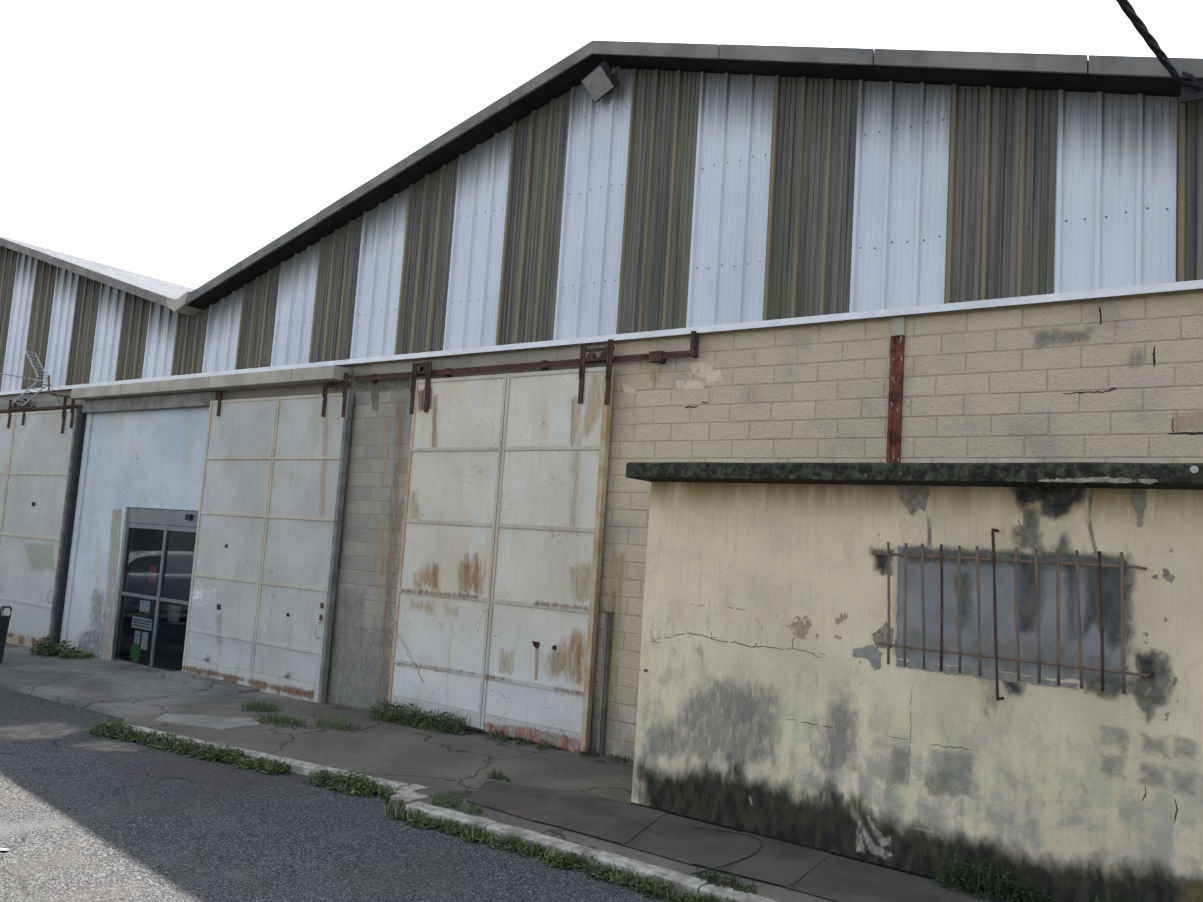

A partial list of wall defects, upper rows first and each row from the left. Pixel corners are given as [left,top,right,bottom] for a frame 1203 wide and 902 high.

rust [376,388,480,692]
leakage [873,487,1157,644]
crack [649,604,826,658]
rust [536,634,584,694]
leakage [1007,682,1022,694]
leakage [1087,652,1179,721]
rust [483,722,580,753]